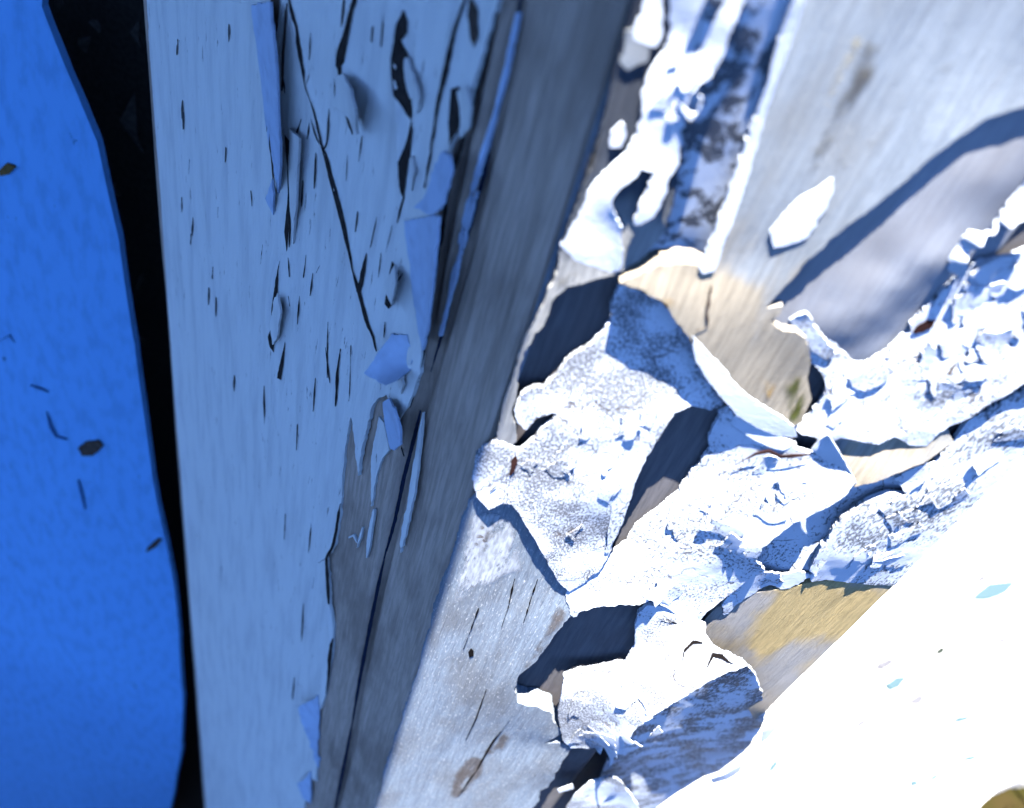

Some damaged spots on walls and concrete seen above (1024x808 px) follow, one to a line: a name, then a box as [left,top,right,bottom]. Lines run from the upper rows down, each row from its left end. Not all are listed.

crack [268,0,377,380]
crack [30,385,68,440]
peeling [460,0,1024,808]
crack [77,480,86,510]
peeling [297,695,321,804]